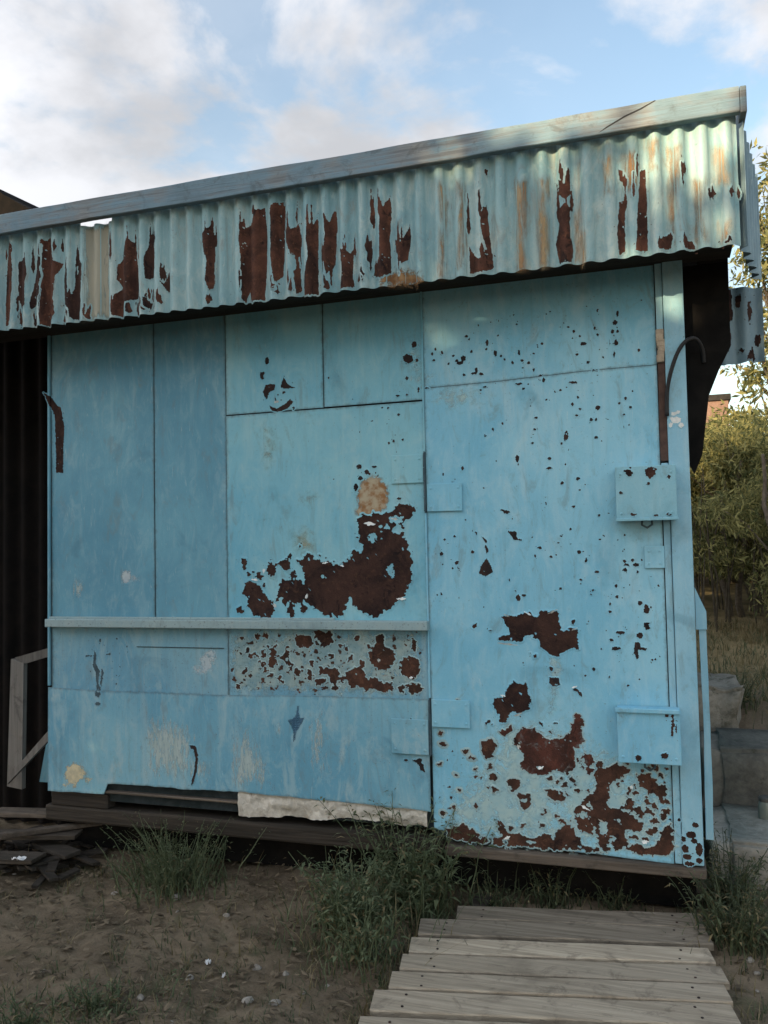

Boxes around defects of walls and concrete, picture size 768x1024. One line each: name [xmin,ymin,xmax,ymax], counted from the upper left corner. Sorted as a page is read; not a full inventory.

corrosion [516,181,526,270]
corrosion [83,226,109,318]
corrosion [378,268,423,288]
corrosion [356,477,389,516]
corrosion [664,714,678,741]